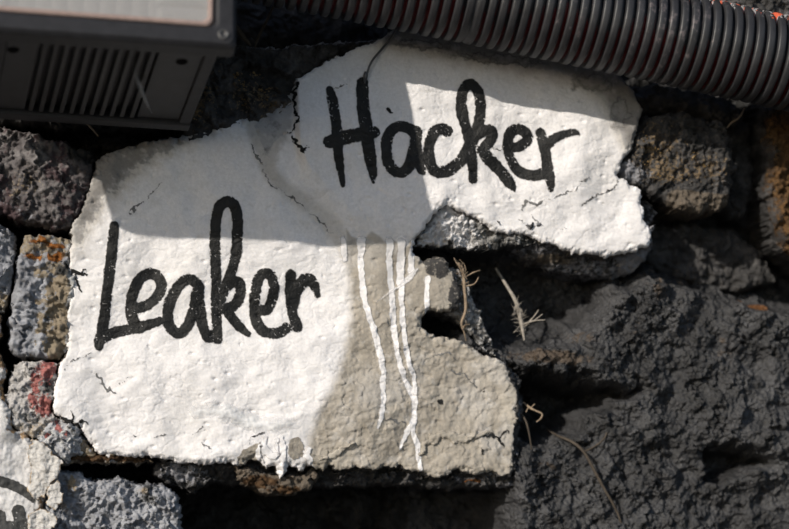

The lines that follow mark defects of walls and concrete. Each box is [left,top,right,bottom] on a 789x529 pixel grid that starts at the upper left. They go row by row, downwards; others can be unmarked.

crack [518,177,618,226]
spalling [412,206,537,257]
spalling [237,435,328,479]
water stain [399,418,423,471]
peeling [27,439,64,529]